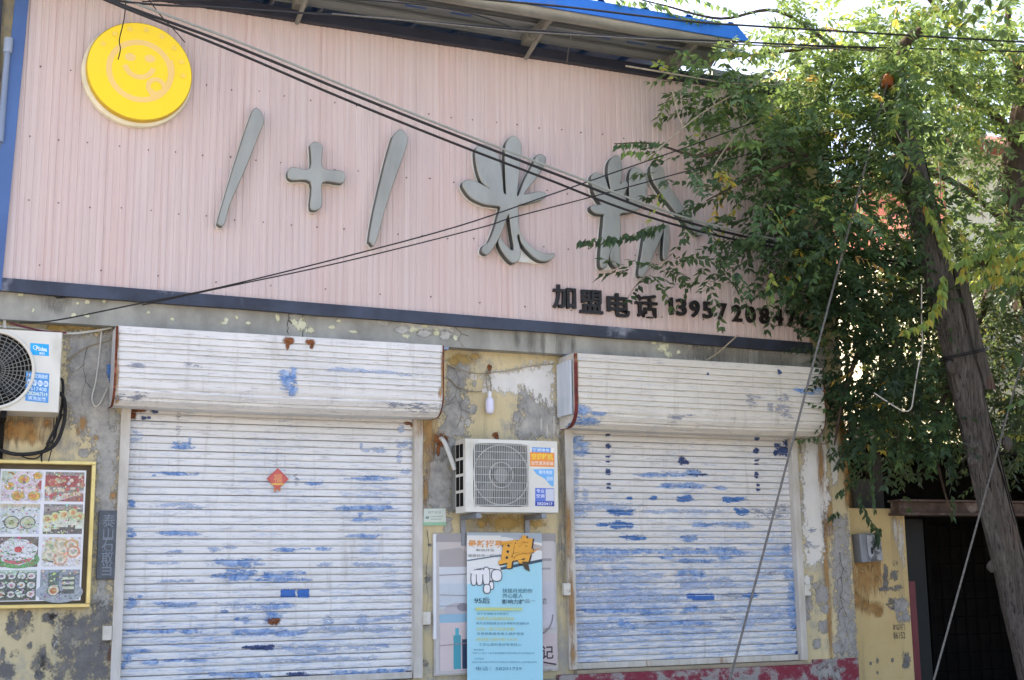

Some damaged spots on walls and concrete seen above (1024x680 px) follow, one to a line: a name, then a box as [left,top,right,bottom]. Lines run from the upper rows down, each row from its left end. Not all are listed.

rust [283,337,315,350]
peeling [34,302,415,680]
peeling [344,358,859,680]
crack [837,553,848,632]
leakage [863,517,904,616]
peeling [893,594,911,625]